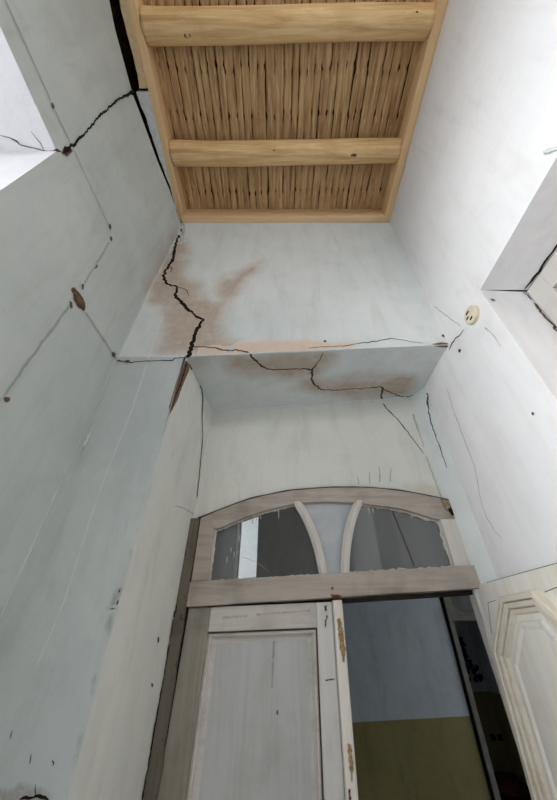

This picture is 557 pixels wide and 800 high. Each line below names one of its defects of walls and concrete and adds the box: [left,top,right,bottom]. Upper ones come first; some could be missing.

crack [0,0,134,291]
crack [0,226,502,539]
leakage [138,220,427,402]
crack [525,245,557,331]